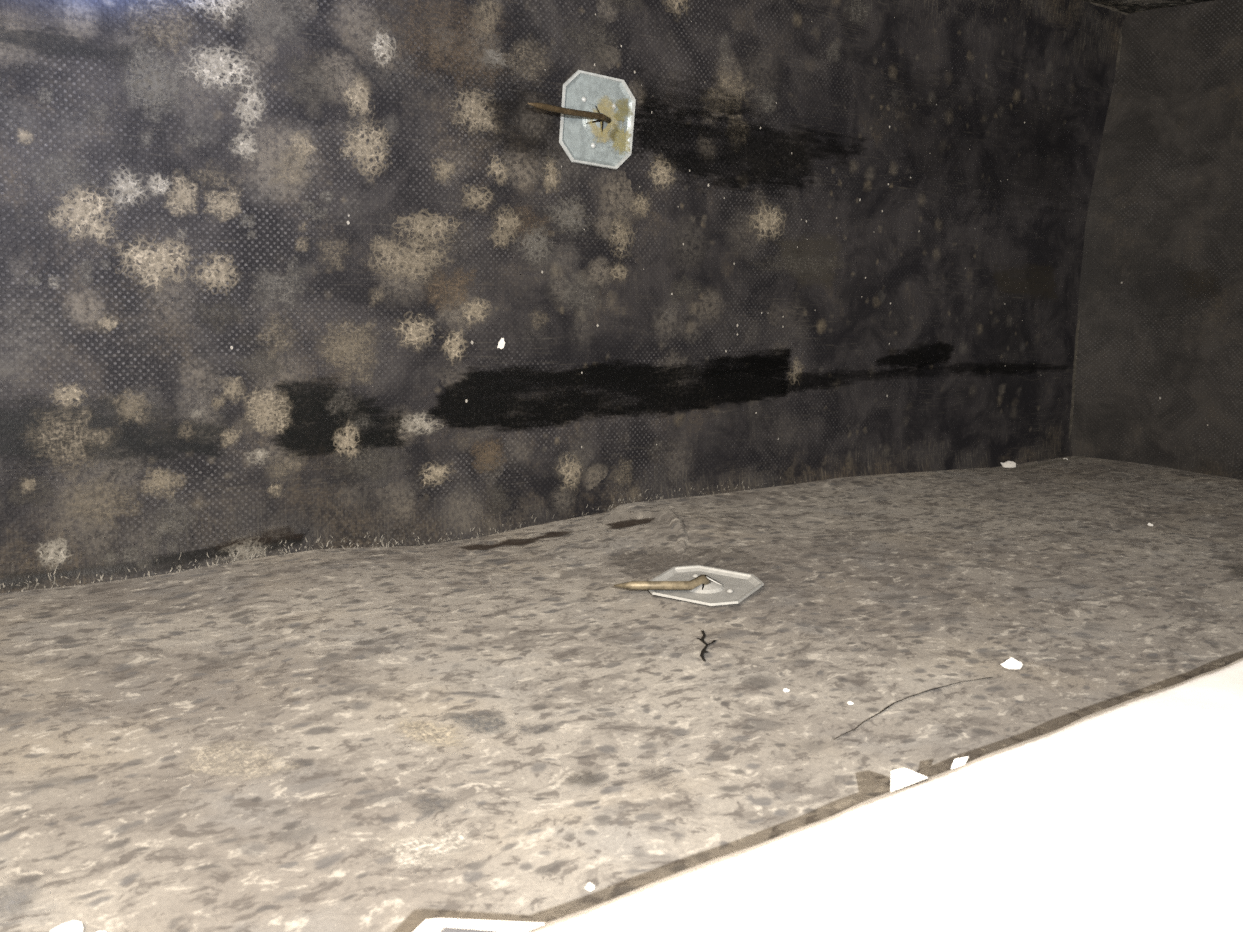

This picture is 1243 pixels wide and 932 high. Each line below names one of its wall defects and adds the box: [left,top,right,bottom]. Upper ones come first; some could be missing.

mould [127,0,264,155]
mould [190,0,304,36]
mould [288,59,384,172]
mould [371,0,542,131]
leakage [634,76,857,187]
mould [37,159,255,239]
mould [120,231,189,291]
mould [200,255,236,289]
leakage [373,215,486,359]
leakage [0,387,238,471]
leakage [215,322,1055,495]
mould [38,542,72,564]